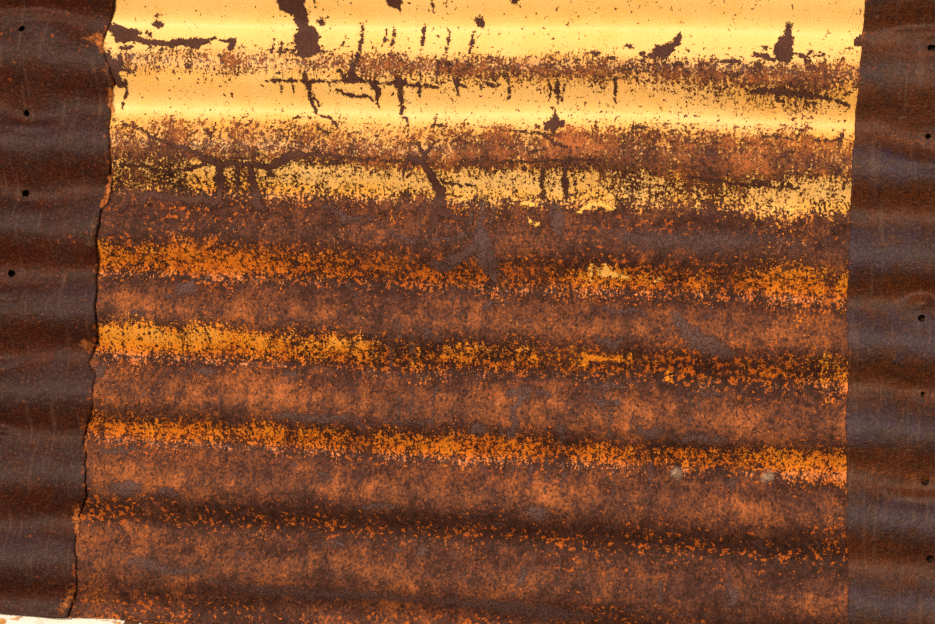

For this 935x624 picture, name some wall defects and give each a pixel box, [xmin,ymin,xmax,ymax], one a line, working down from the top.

corrosion [87,33,115,61]
peeling [104,13,237,110]
peeling [270,0,346,58]
peeling [386,0,403,12]
peeling [468,15,485,54]
corrosion [120,39,859,119]
peeling [543,79,567,133]
peeling [589,33,690,66]
peeling [753,22,825,65]
peeling [400,116,504,286]
peeling [520,163,616,235]
corrosion [59,112,855,624]